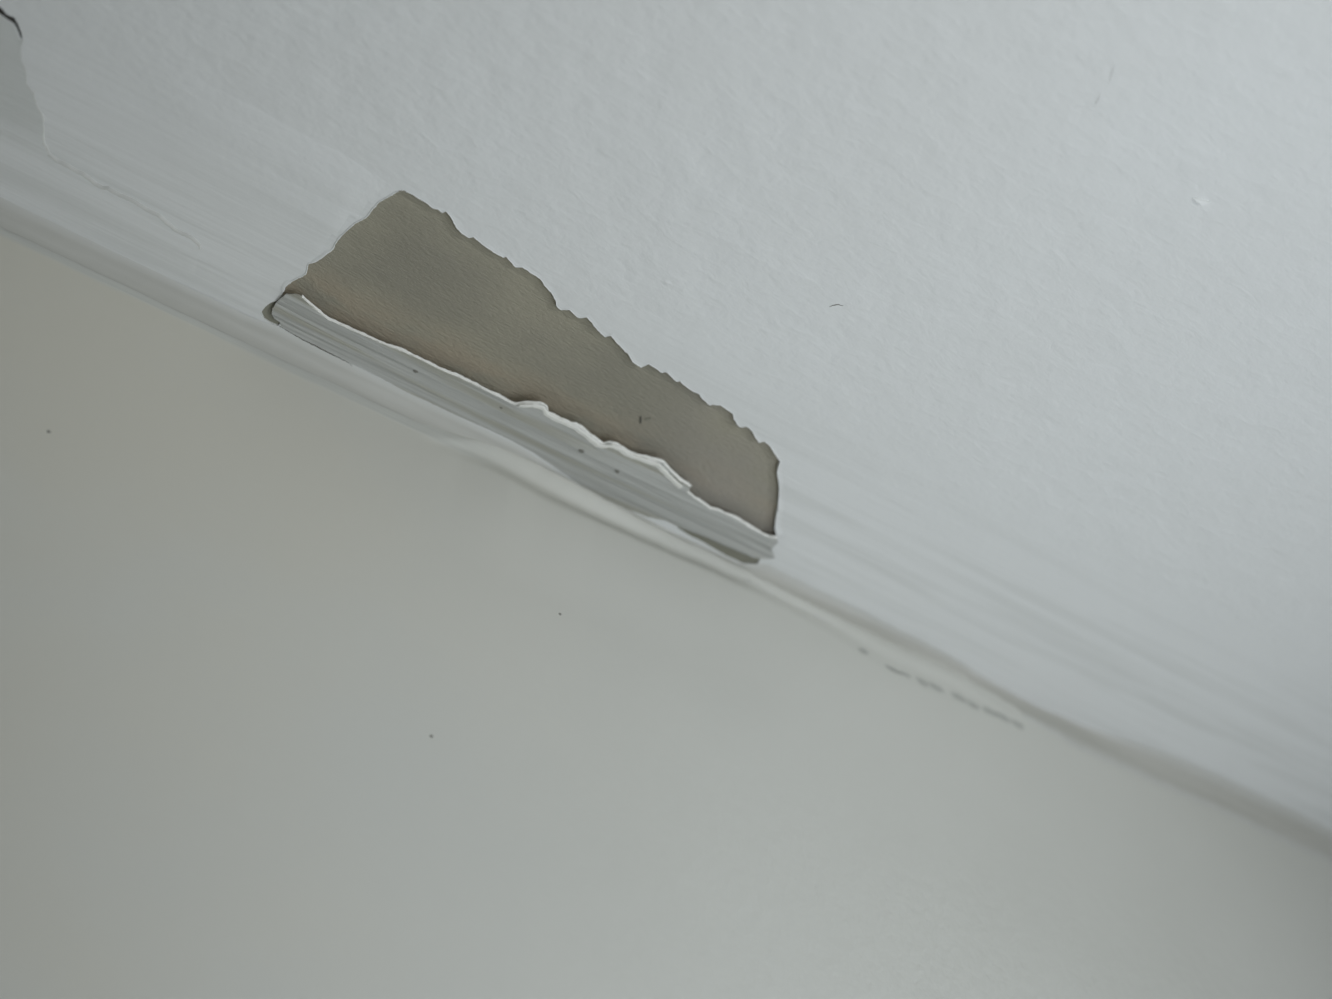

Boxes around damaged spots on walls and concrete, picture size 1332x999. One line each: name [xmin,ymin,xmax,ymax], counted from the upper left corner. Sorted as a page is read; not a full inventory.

peeling [262,187,784,564]